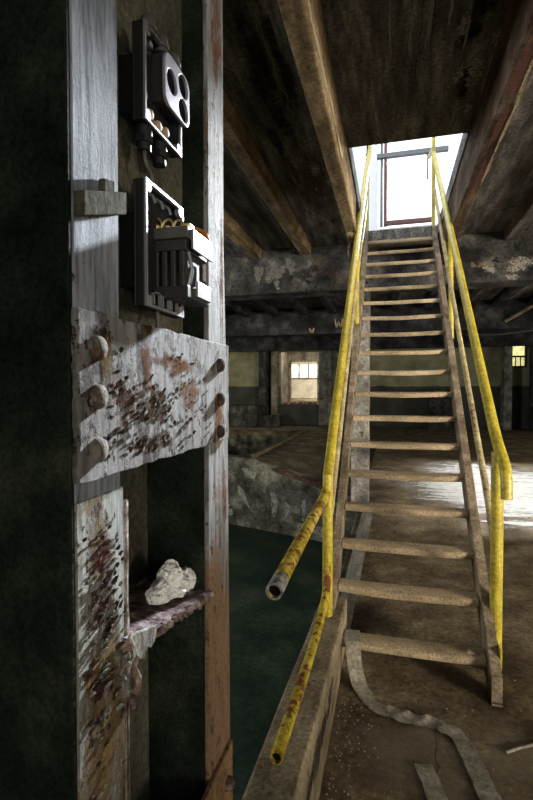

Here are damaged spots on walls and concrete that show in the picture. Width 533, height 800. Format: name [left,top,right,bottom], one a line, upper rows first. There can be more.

damp [307,0,343,158]
damp [254,258,297,290]
rust [142,349,188,395]